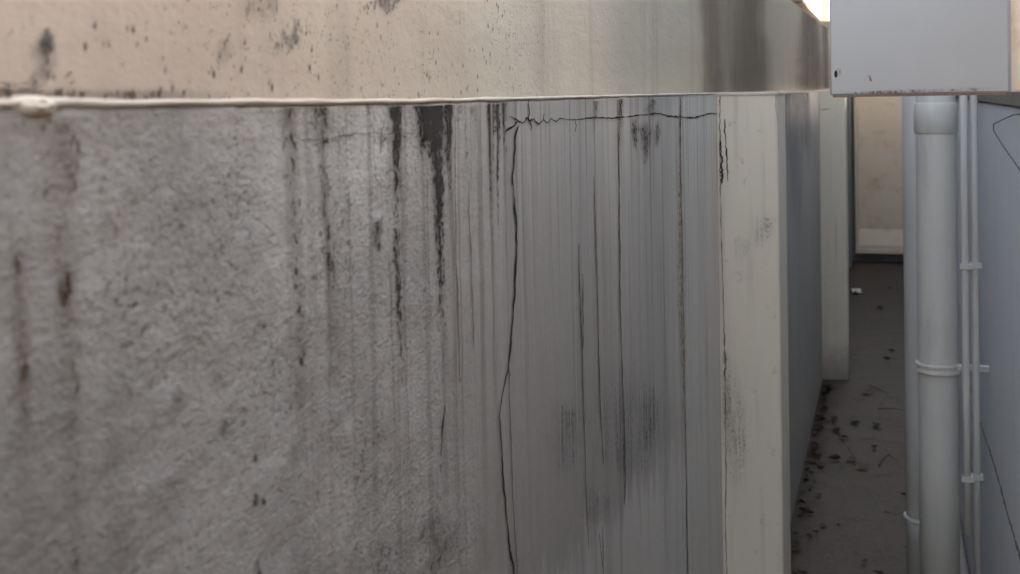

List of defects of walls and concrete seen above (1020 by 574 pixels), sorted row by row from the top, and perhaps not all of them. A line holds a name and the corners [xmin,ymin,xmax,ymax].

water stain [311,108,335,292]
water stain [390,105,453,361]
water stain [487,103,507,196]
crack [499,97,728,574]